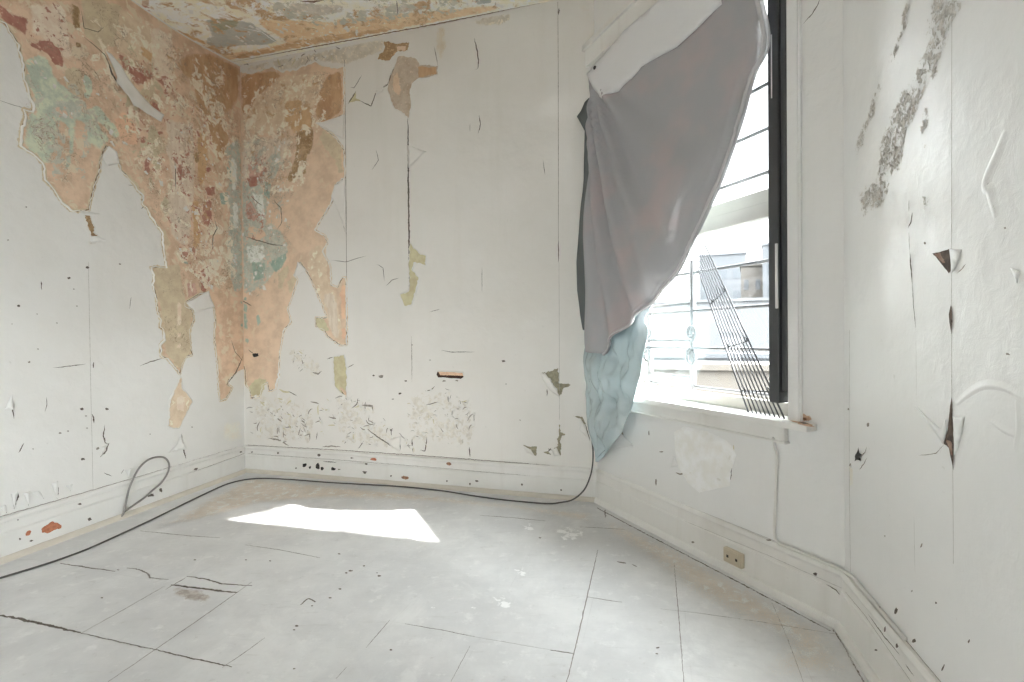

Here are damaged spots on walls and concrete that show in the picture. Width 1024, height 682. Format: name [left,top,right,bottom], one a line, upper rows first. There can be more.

peeling [0,0,549,474]
peeling [854,84,881,152]
peeling [860,0,961,216]
crack [947,93,955,386]